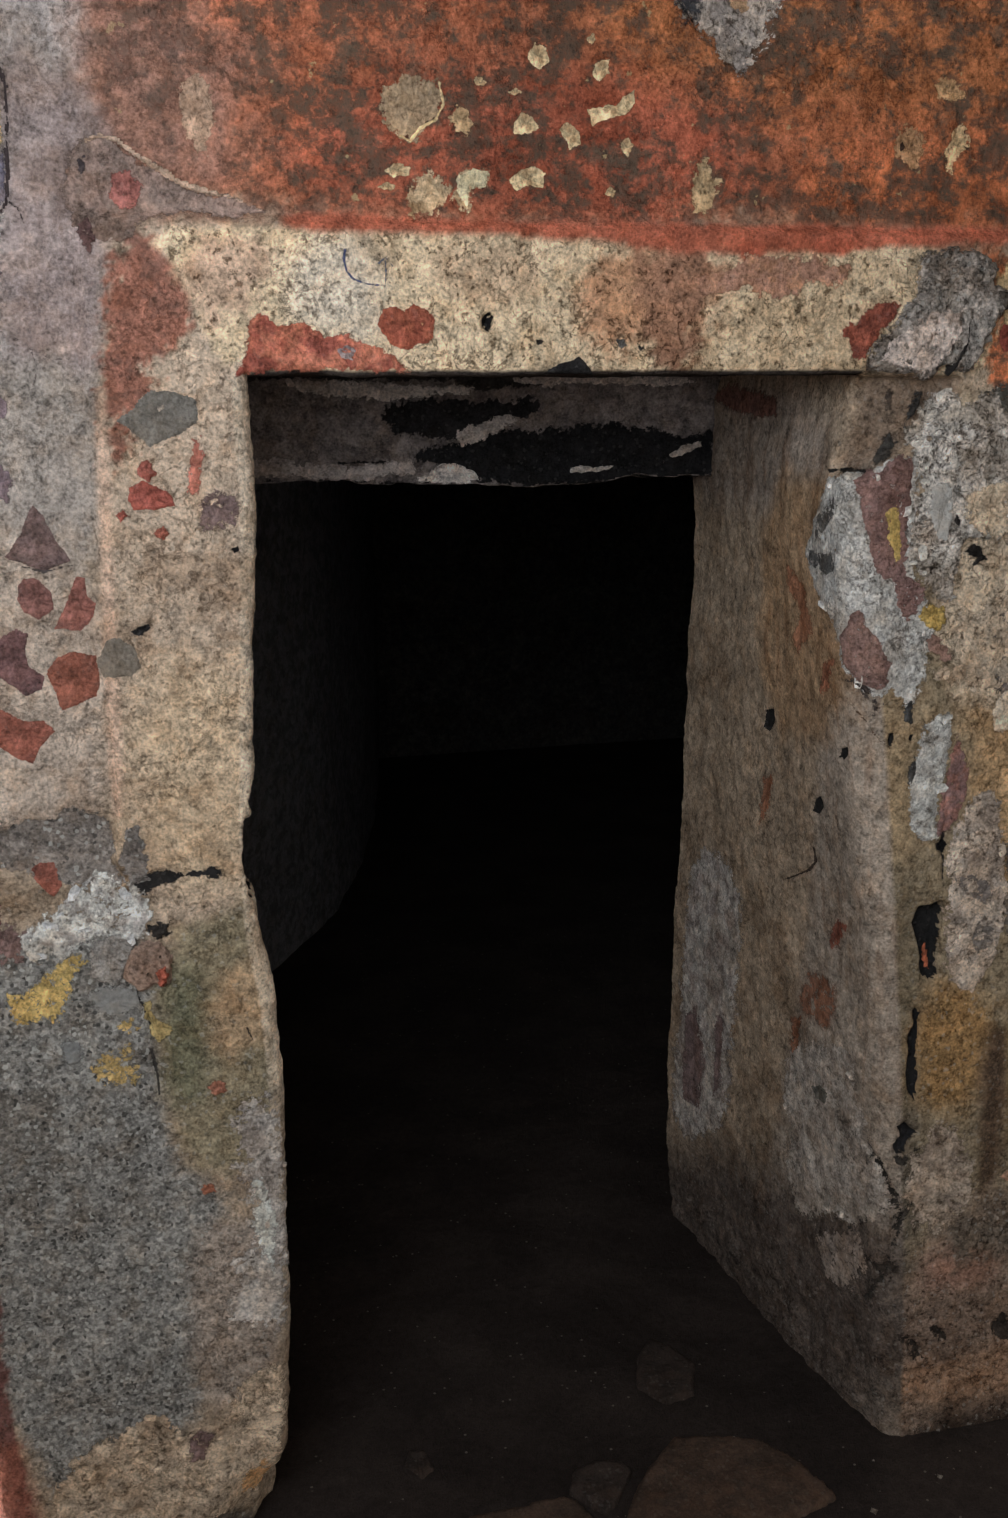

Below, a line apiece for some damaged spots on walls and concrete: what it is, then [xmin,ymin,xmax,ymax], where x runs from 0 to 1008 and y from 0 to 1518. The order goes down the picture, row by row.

flaking render [674,0,784,82]
crack [0,67,23,220]
peeling [285,378,475,402]
peeling [513,376,696,388]
peeling [254,411,517,484]
peeling [669,441,702,457]
peeling [570,465,613,473]